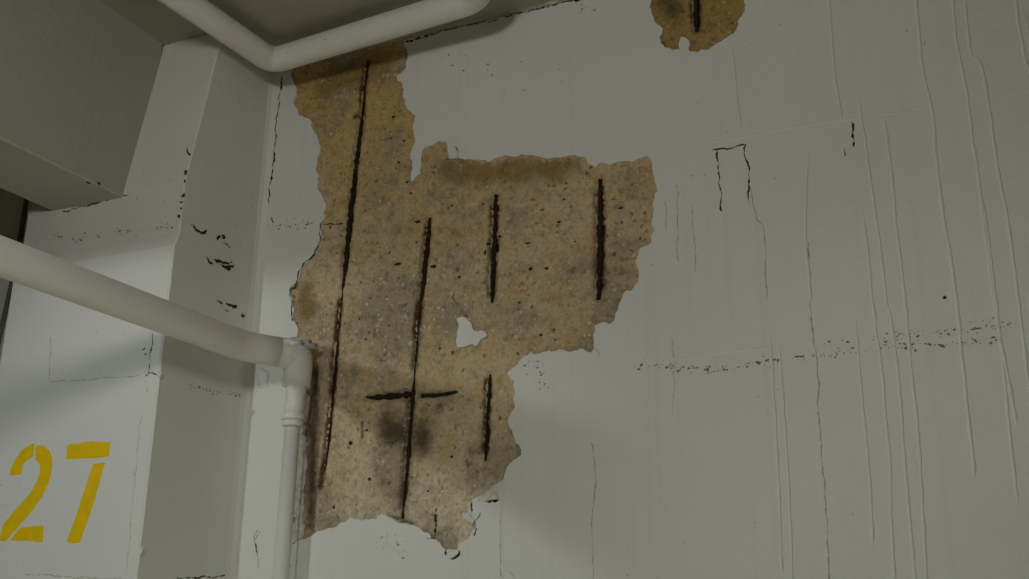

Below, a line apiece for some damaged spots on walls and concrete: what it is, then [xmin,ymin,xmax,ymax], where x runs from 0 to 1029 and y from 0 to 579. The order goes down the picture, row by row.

spalling [650,0,745,52]
crack [268,77,283,223]
rust [412,301,422,338]
spalling [291,40,658,559]
crack [665,184,696,271]
crack [713,144,768,298]
crack [844,123,855,156]
rust [317,299,342,489]
crack [808,241,830,579]